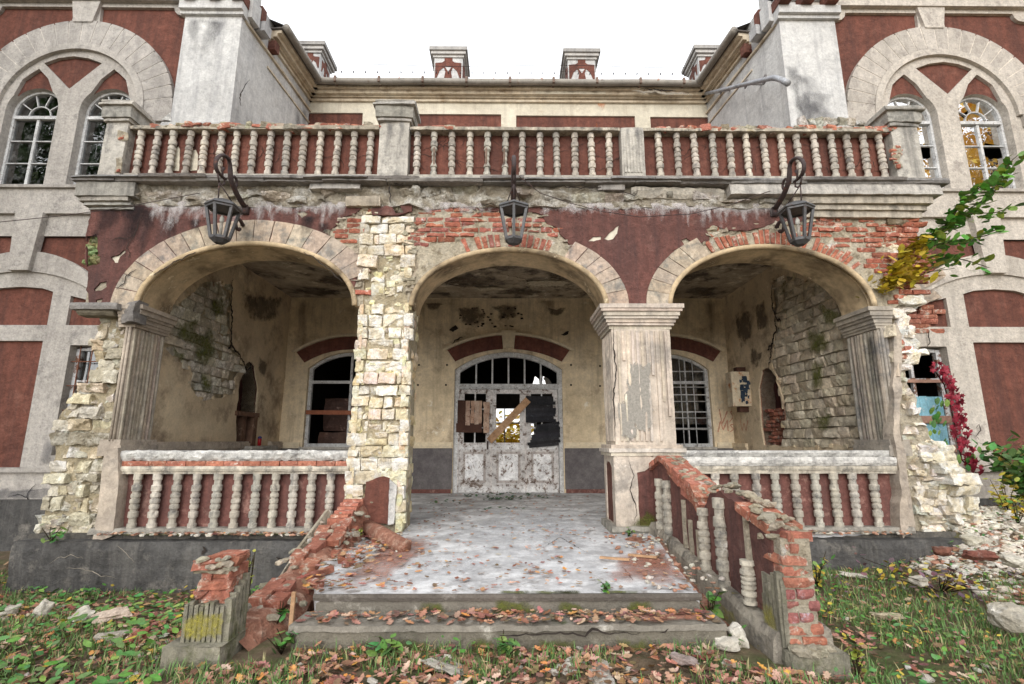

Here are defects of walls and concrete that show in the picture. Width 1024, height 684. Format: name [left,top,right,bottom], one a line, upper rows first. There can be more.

crack [228,280,252,370]
peeling [297,276,371,295]
spalling [323,205,572,295]
peeling [442,266,570,342]
crack [611,328,619,437]
peeling [617,363,654,439]
crack [767,286,781,369]
spalling [674,218,946,333]
spalling [760,273,860,450]